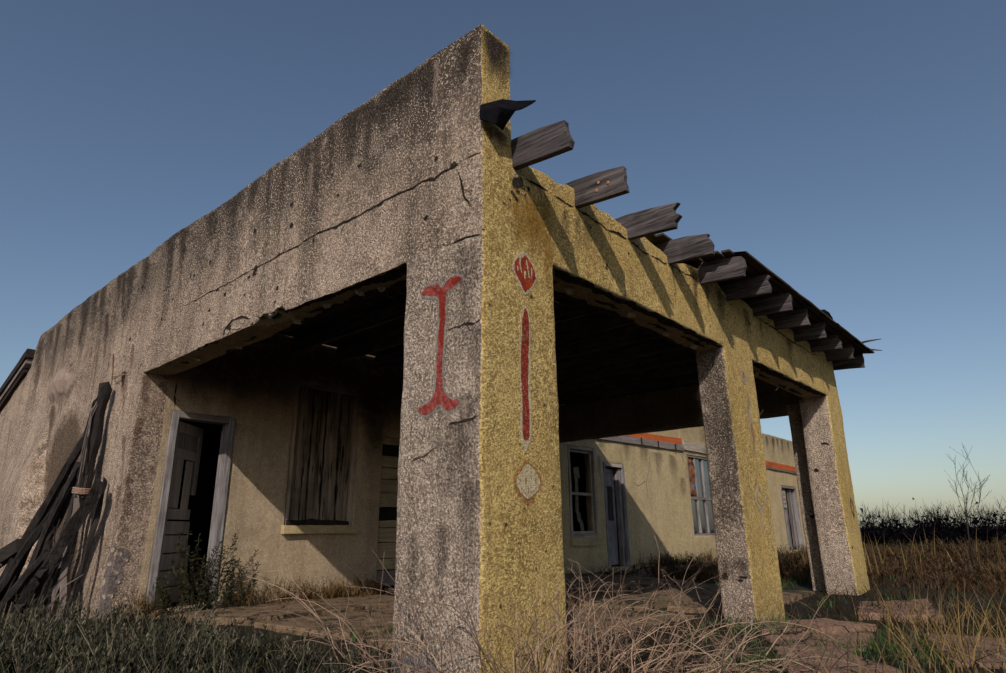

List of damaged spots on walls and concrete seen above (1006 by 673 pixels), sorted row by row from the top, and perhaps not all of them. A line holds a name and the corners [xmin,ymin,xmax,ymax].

water stain [167,227,189,276]
water stain [208,171,271,232]
crack [187,153,481,305]
crack [525,178,697,279]
water stain [38,258,149,358]
crack [448,416,477,433]